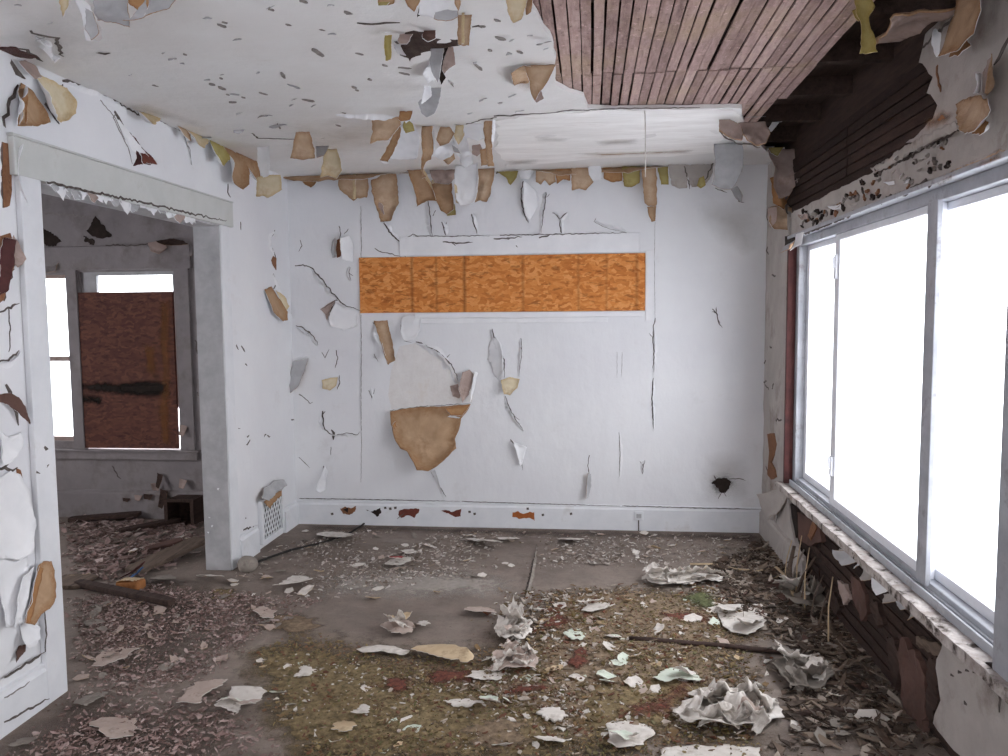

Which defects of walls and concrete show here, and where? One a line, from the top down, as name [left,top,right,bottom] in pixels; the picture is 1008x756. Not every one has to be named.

peeling [2,75,77,128]
peeling [113,111,157,166]
flaking render [178,0,1008,253]
peeling [264,273,293,321]
crack [268,192,626,462]
crack [649,240,658,430]
peeling [373,315,478,517]
peeling [0,384,56,663]
peeling [331,506,419,519]
peeling [512,508,544,521]
peeling [832,549,914,620]
peeling [916,636,942,729]